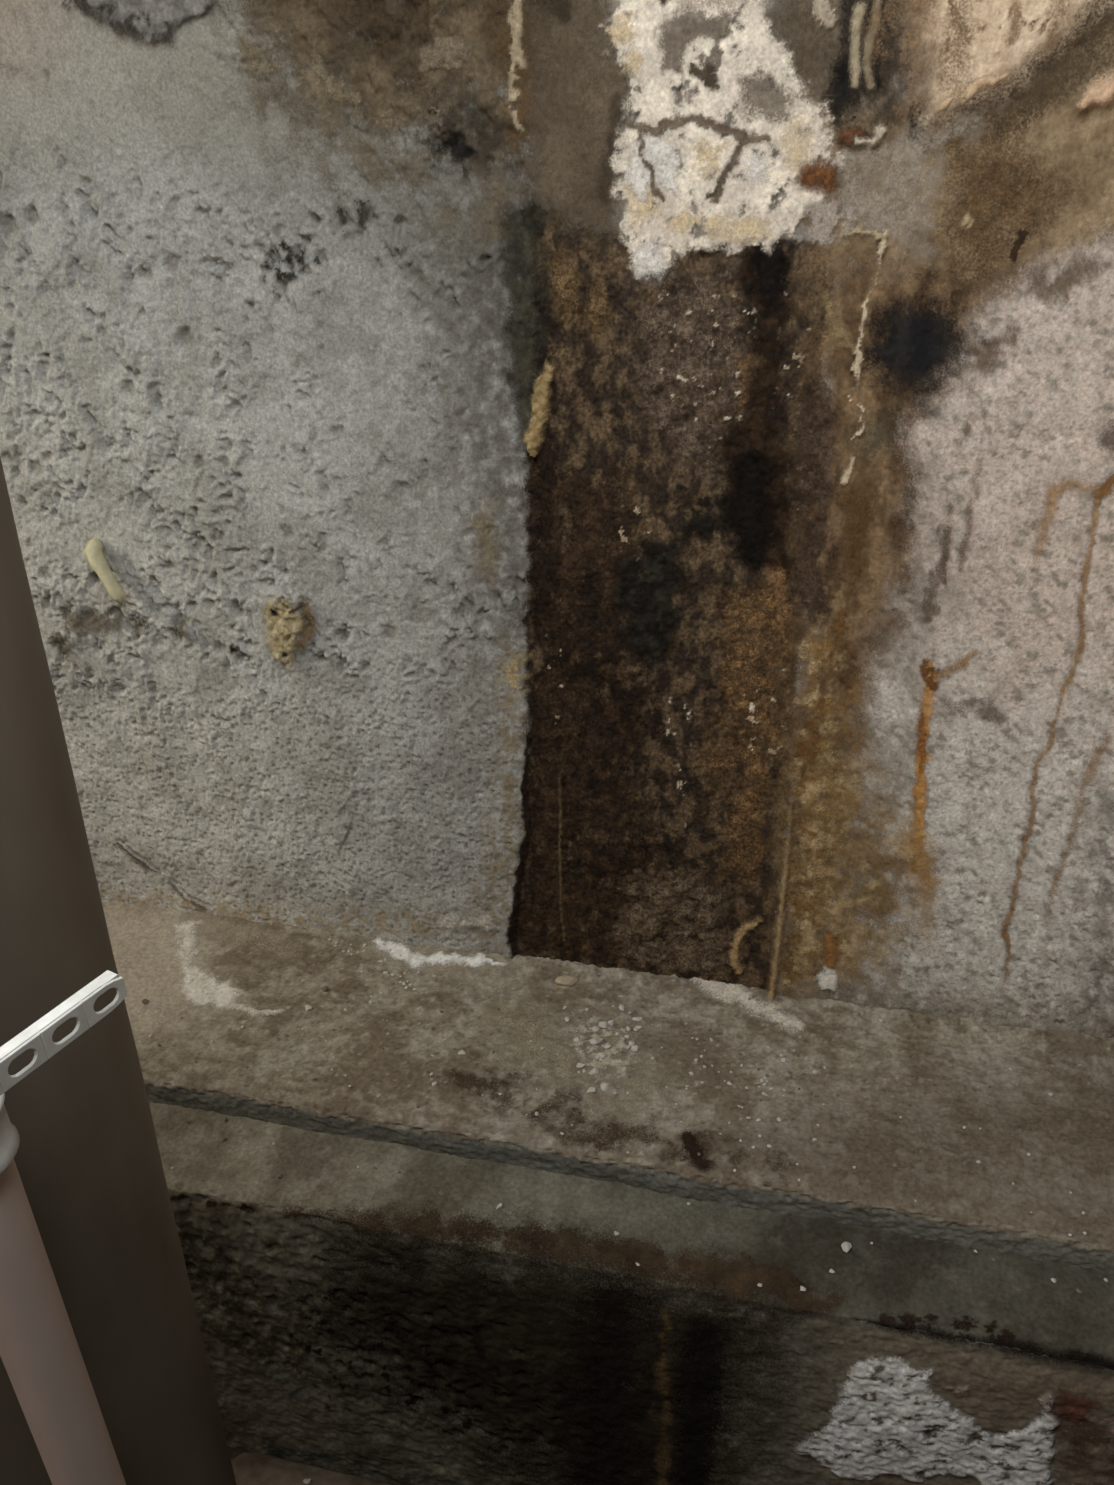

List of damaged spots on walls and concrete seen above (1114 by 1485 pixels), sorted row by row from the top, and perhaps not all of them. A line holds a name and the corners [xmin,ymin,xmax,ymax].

crack [625,113,771,203]
flaking render [507,0,863,992]
water stain [611,0,1114,1033]
water stain [171,915,304,1016]
water stain [437,910,492,929]
rust [778,609,978,993]
rust [1001,474,1114,982]
water stain [294,1221,793,1485]